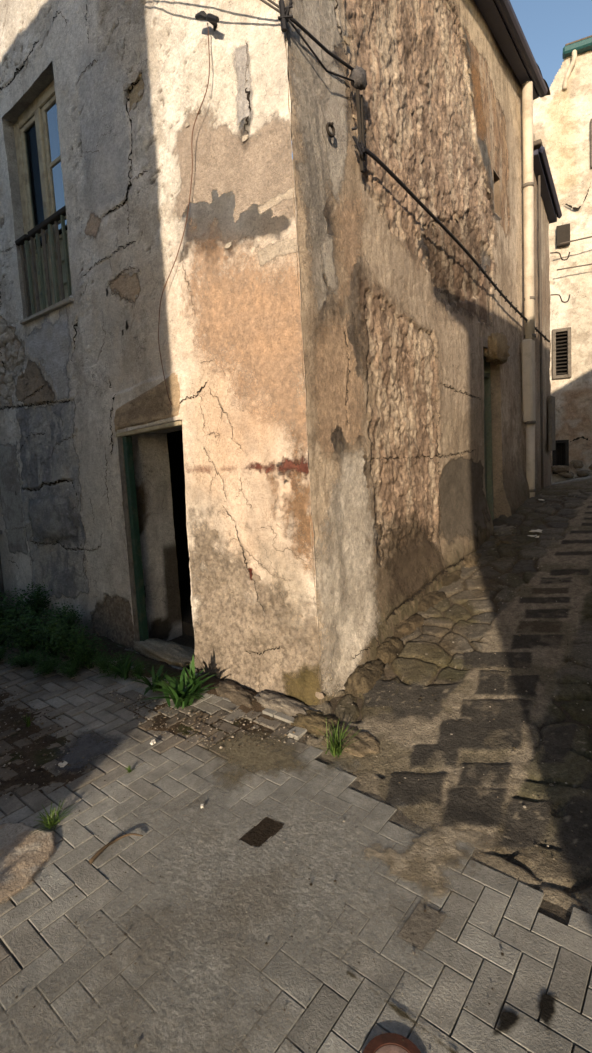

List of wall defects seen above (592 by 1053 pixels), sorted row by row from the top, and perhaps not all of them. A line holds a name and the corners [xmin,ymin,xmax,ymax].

crack [0,41,39,91]
crack [53,4,98,85]
crack [80,72,148,303]
peeling [173,107,296,224]
peeling [0,316,89,602]
crack [180,360,303,612]
corrosion [249,457,309,488]